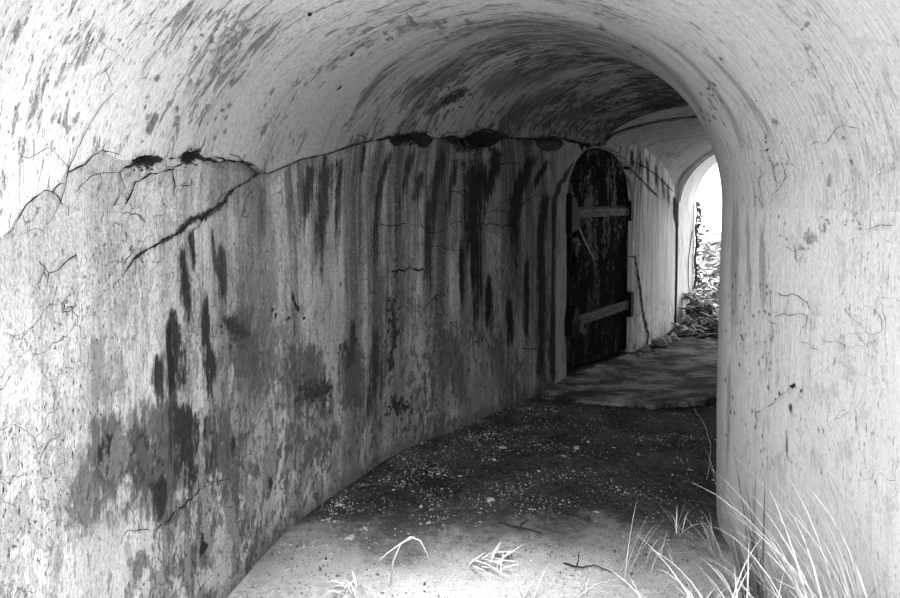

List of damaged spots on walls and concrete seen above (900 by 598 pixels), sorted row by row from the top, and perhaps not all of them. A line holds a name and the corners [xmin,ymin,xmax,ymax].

water stain [73,231,243,537]
flaking render [131,148,218,172]
water stain [211,230,265,392]
water stain [285,155,343,286]
water stain [282,320,385,420]
crack [5,41,698,306]
flaking render [389,130,433,148]
flaking render [446,128,508,157]
water stain [398,147,576,382]
crack [758,152,794,207]
crack [769,293,882,350]
crack [120,479,230,556]